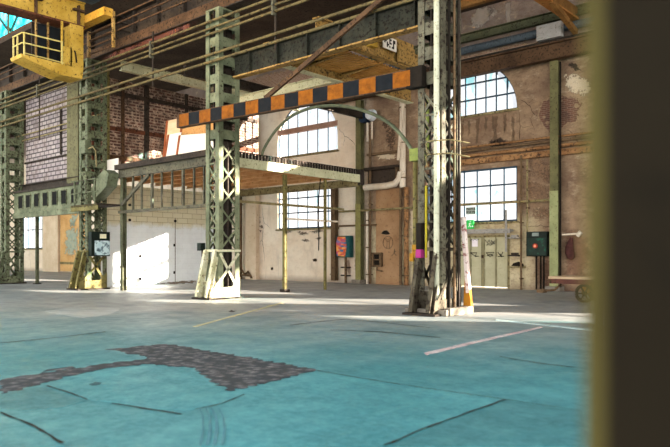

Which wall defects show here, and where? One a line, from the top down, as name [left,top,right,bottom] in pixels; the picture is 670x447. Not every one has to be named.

spalling [561,94,584,129]